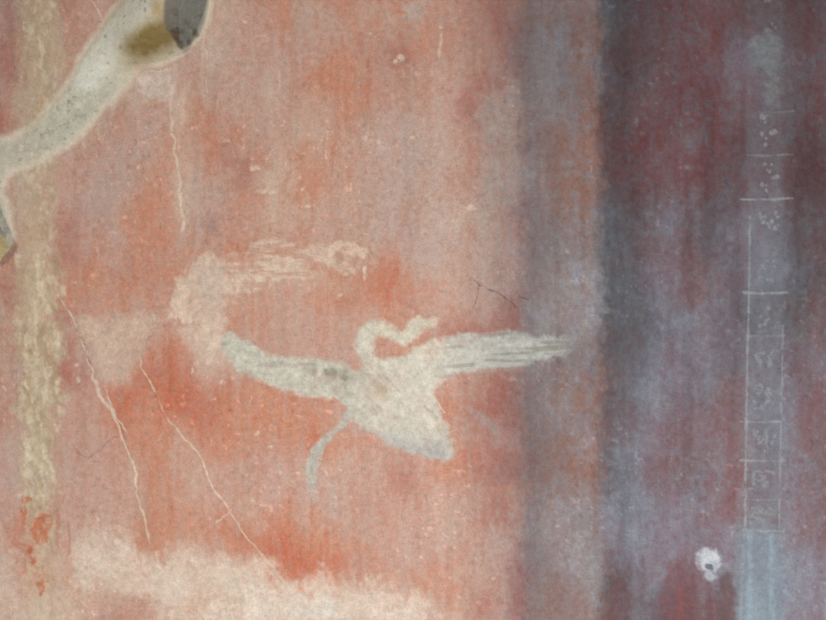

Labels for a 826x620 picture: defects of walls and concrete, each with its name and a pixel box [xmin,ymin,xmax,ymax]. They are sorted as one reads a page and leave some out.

crack [168,104,186,234]
crack [57,294,151,545]
crack [139,367,265,555]
peeling [0,494,55,620]
peeling [701,562,720,583]